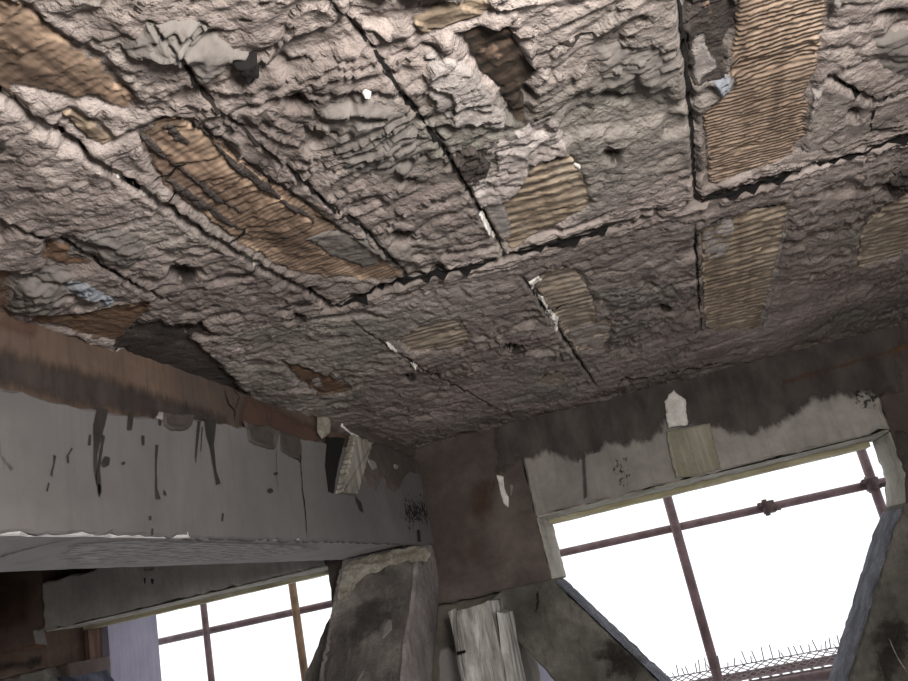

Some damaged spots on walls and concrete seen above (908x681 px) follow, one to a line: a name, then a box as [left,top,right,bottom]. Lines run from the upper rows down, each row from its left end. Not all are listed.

crack [0,86,30,111]
peeling [0,0,133,107]
crack [16,225,156,296]
peeling [62,109,113,144]
crack [58,126,203,230]
peeling [139,117,403,283]
peeling [414,0,589,248]
crack [184,0,908,412]
peeling [534,266,614,351]
peeling [701,204,788,331]
peeling [682,0,844,183]
leakage [0,352,227,499]